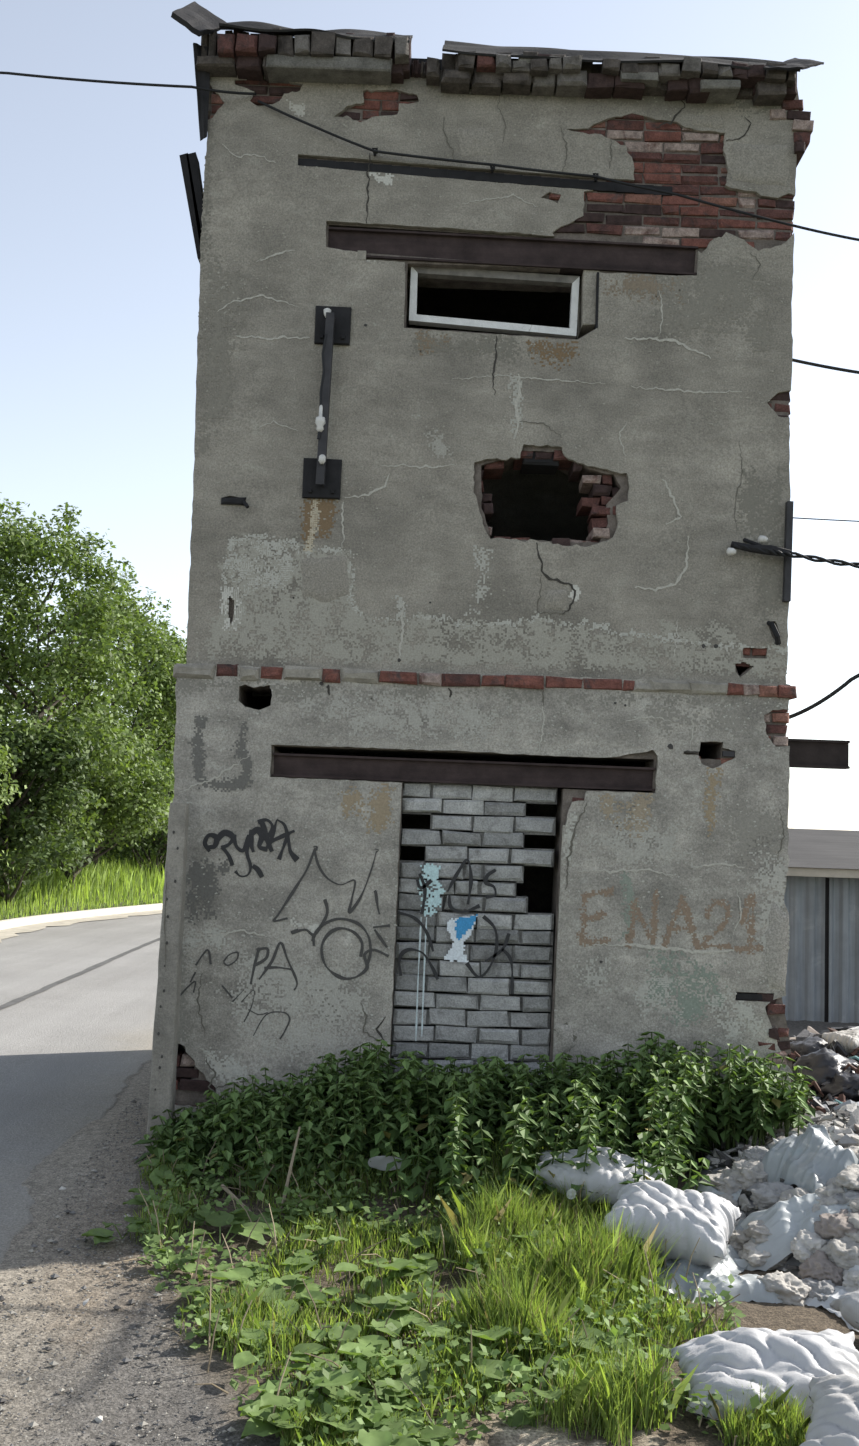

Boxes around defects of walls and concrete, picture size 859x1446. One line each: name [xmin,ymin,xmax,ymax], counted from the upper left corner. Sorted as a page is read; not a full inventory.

spalling [338,91,418,122]
spalling [554,114,795,248]
spalling [770,99,814,167]
spalling [768,392,790,417]
rust [299,498,340,550]
peeling [196,533,788,683]
spalling [481,450,620,546]
crack [536,542,576,615]
crack [635,479,689,592]
peeling [166,928,369,1063]
peeling [706,850,796,1065]
spalling [159,1047,247,1106]